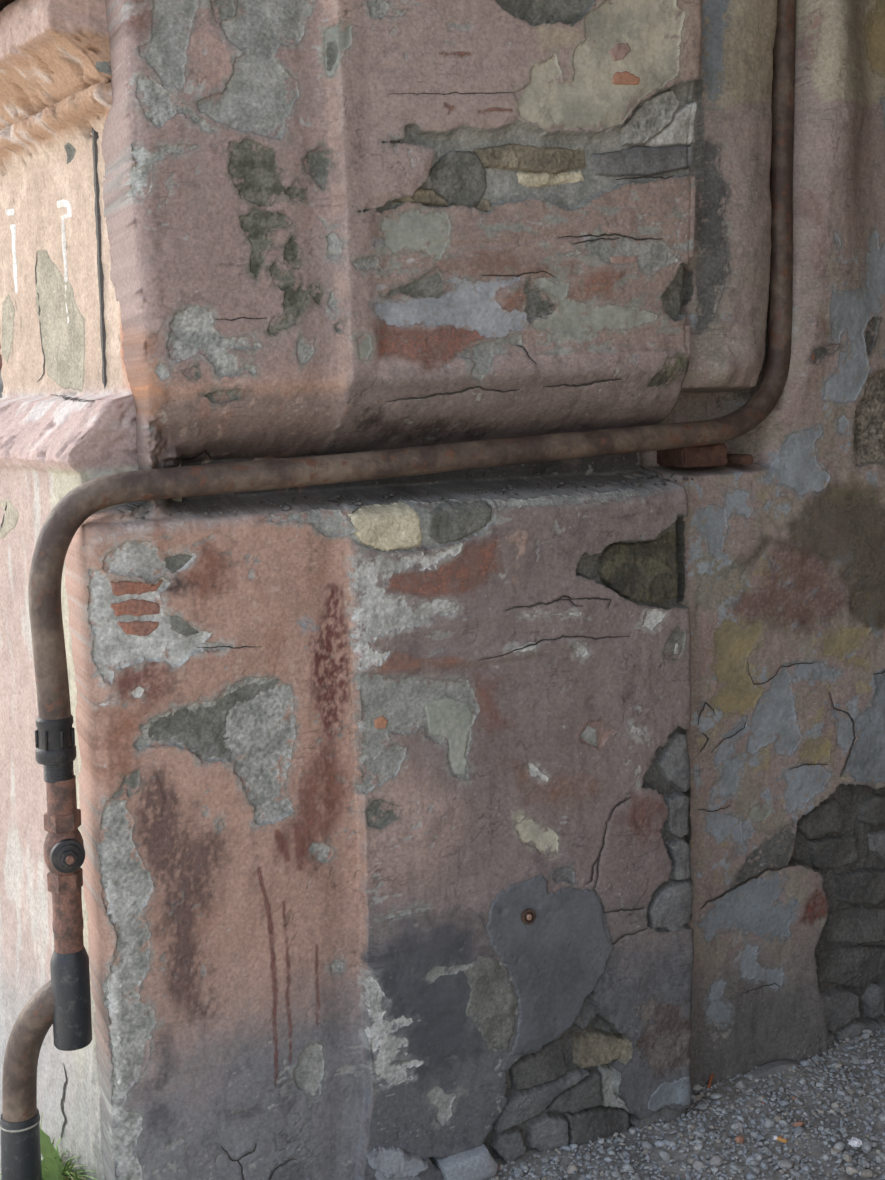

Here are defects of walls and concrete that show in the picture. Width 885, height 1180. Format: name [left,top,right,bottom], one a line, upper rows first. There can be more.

flaking render [352,0,730,338]
spalling [87,540,232,706]
spalling [260,487,652,829]
crack [479,595,630,661]
spalling [575,514,689,630]
spalling [132,677,296,826]
crack [585,796,648,945]
flaking render [580,664,885,1045]
rust [258,867,291,1086]
damp [385,927,472,1072]
crack [220,1144,296,1180]
spalling [366,991,692,1180]